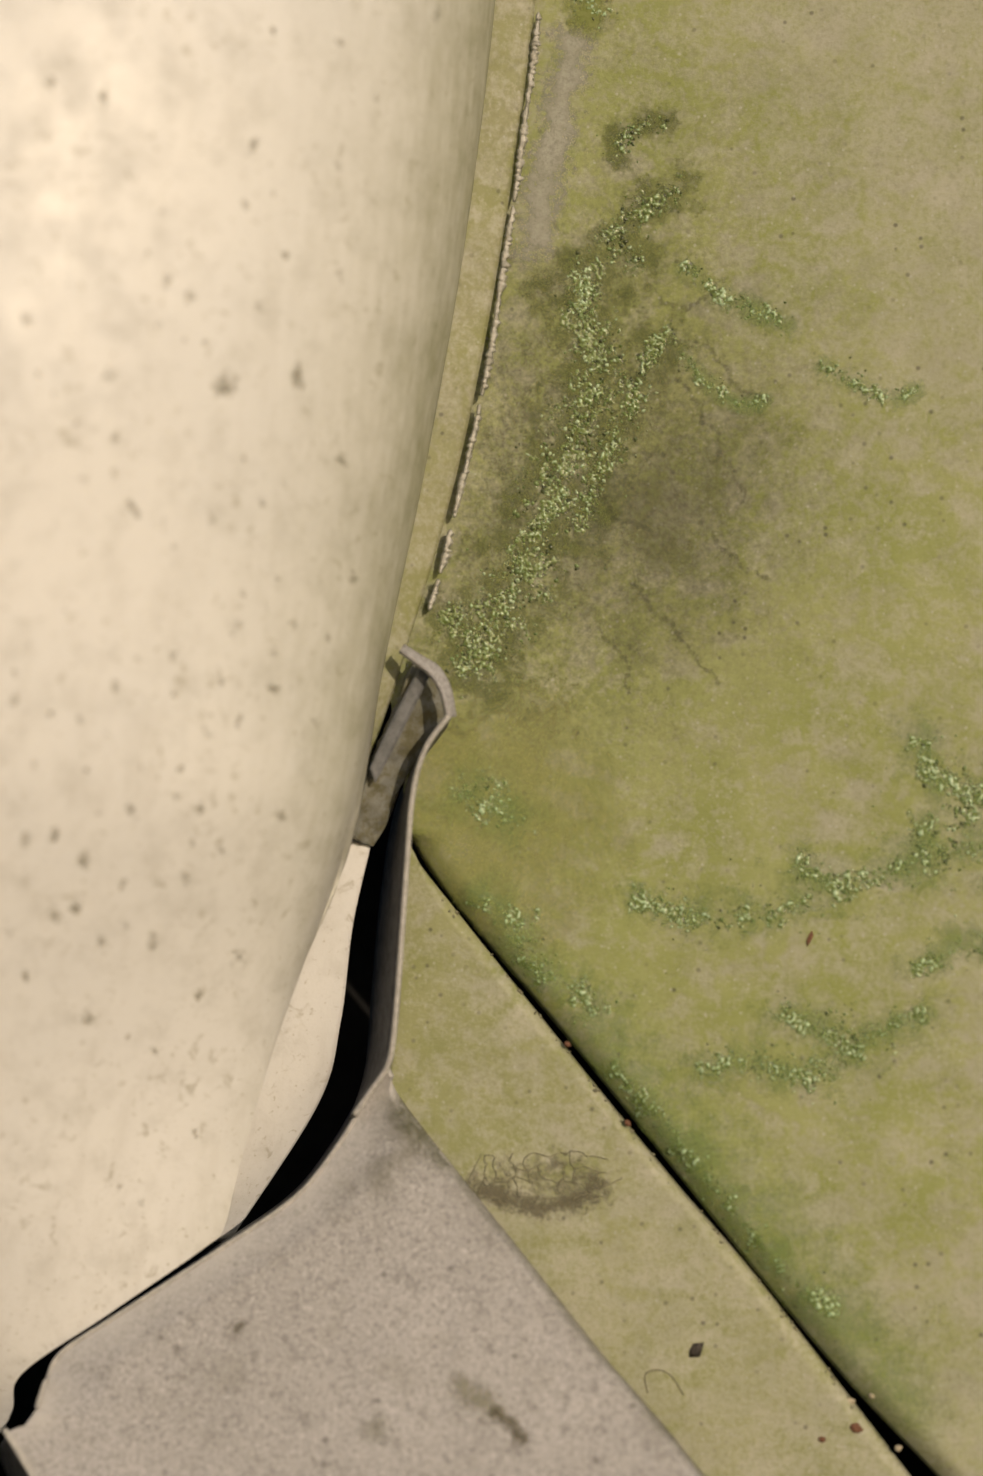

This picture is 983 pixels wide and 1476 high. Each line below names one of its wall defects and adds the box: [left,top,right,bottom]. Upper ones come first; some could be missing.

leakage [510,22,593,263]